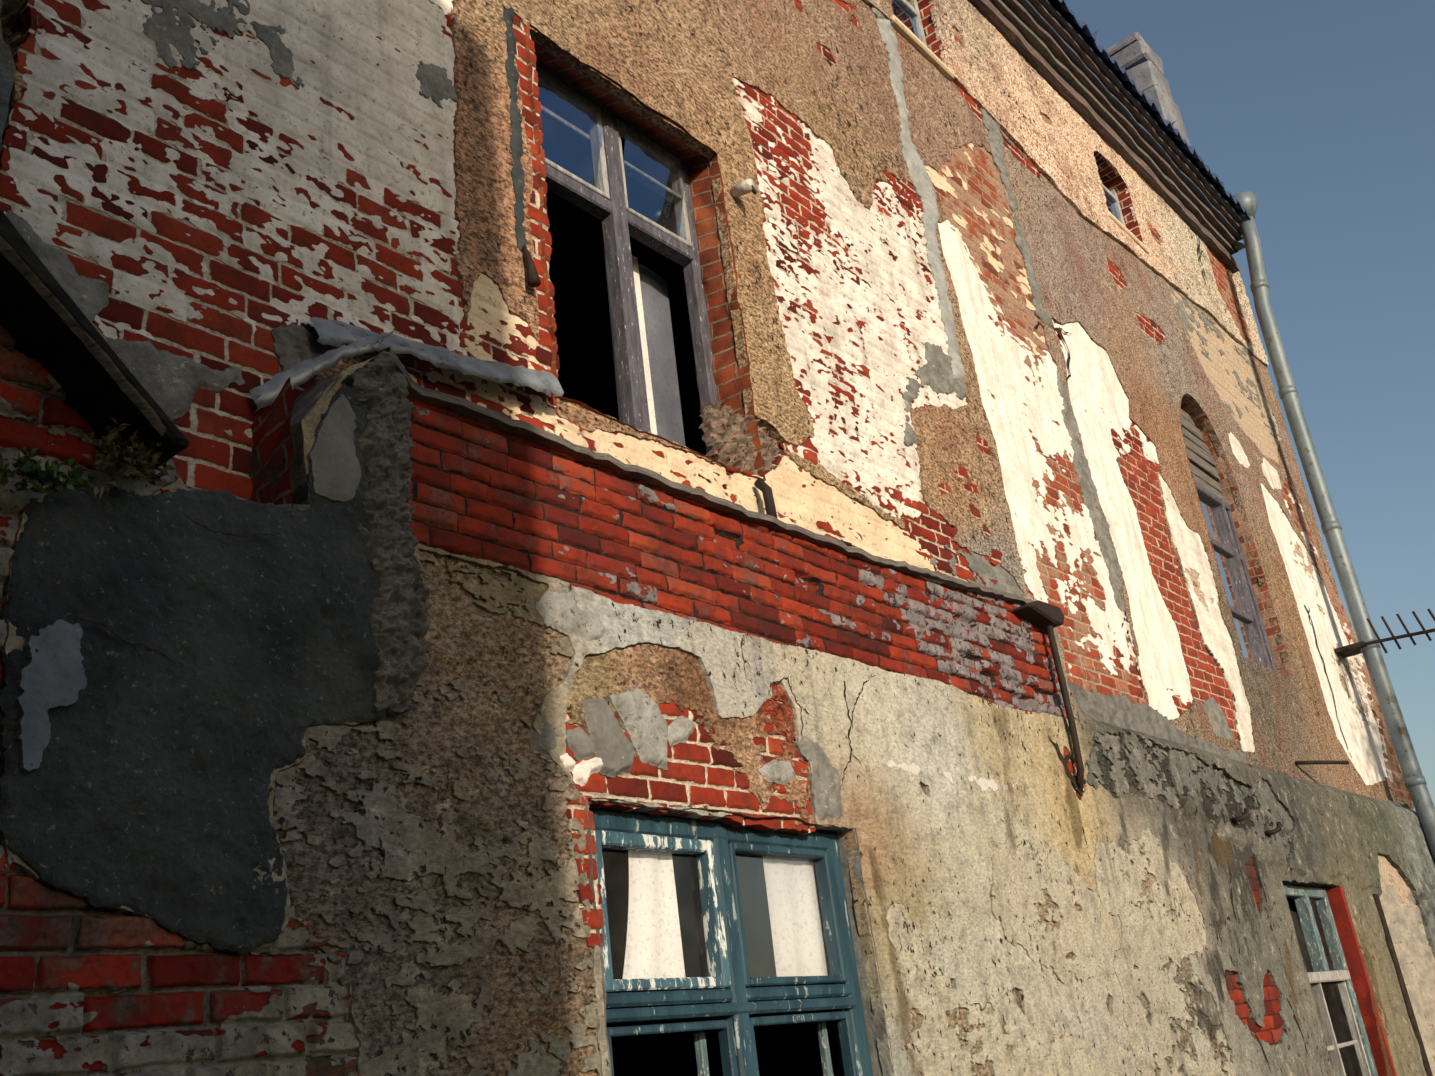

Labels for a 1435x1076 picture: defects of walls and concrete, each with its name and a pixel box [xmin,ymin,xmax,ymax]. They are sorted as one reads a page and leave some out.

spalling [816,42,836,66]
spalling [830,0,862,29]
peeling [0,0,560,646]
peeling [399,78,1255,753]
peeling [1167,247,1414,810]
flaking render [0,396,1067,1076]
crack [841,675,876,786]
flaking render [885,903,1104,1076]
flaking render [989,828,1284,1076]